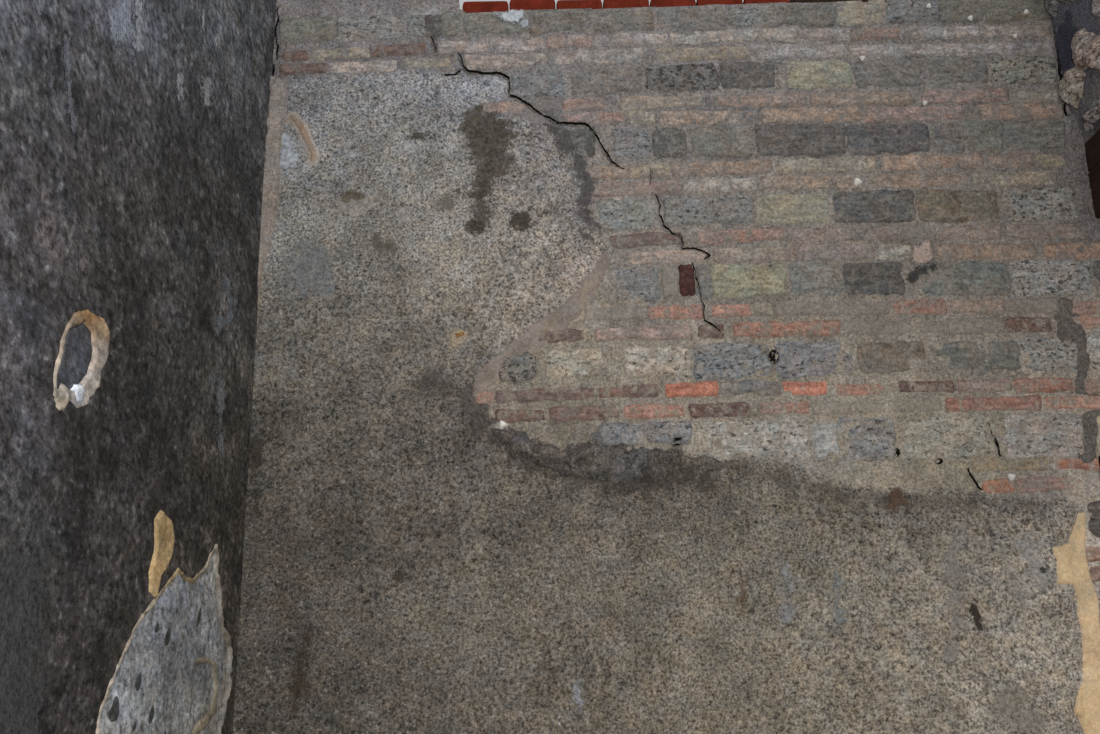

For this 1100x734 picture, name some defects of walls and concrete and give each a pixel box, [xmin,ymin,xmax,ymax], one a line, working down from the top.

damp [455,103,519,236]
damp [509,211,533,232]
damp [543,124,604,240]
crack [431,36,720,331]
spalling [53,309,110,411]
spalling [96,510,233,734]
flaking render [1052,513,1100,734]